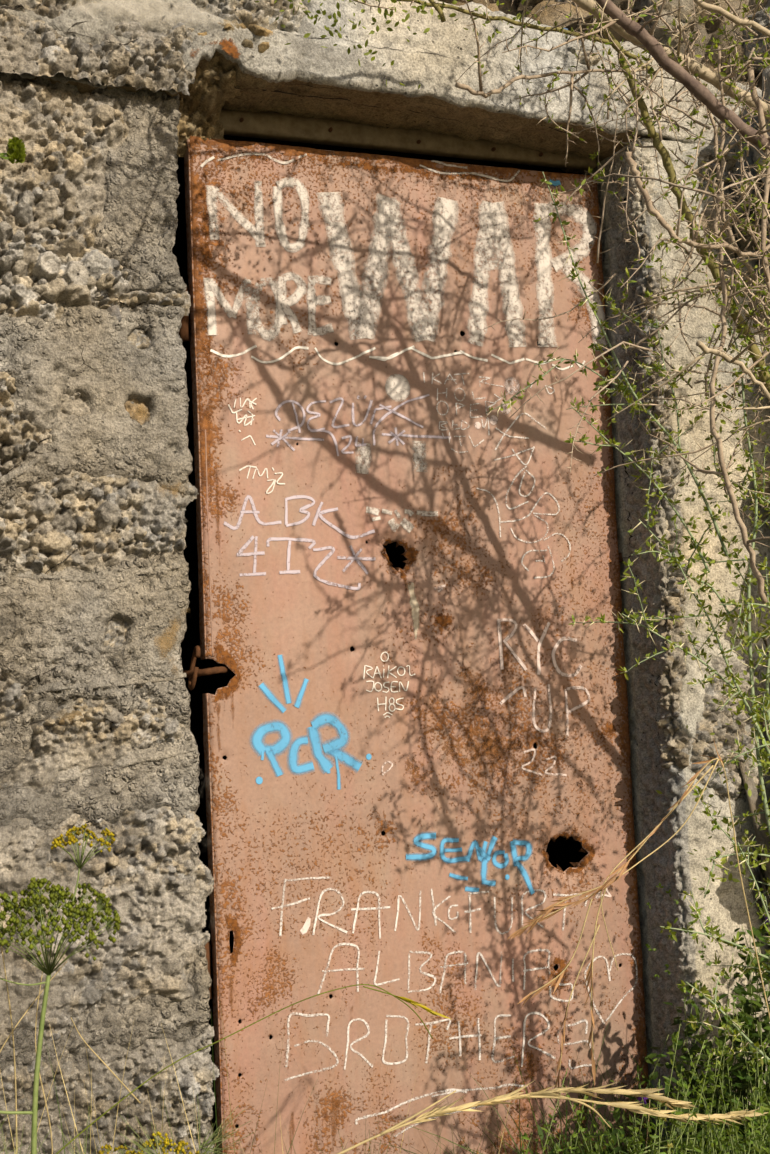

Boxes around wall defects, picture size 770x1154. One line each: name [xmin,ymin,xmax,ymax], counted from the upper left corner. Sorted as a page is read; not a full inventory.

corrosion [199,173,211,285]
corrosion [202,312,214,395]
corrosion [381,539,419,590]
corrosion [498,620,512,677]
corrosion [212,643,240,714]
corrosion [460,669,484,699]
corrosion [442,726,531,777]
corrosion [541,832,603,882]